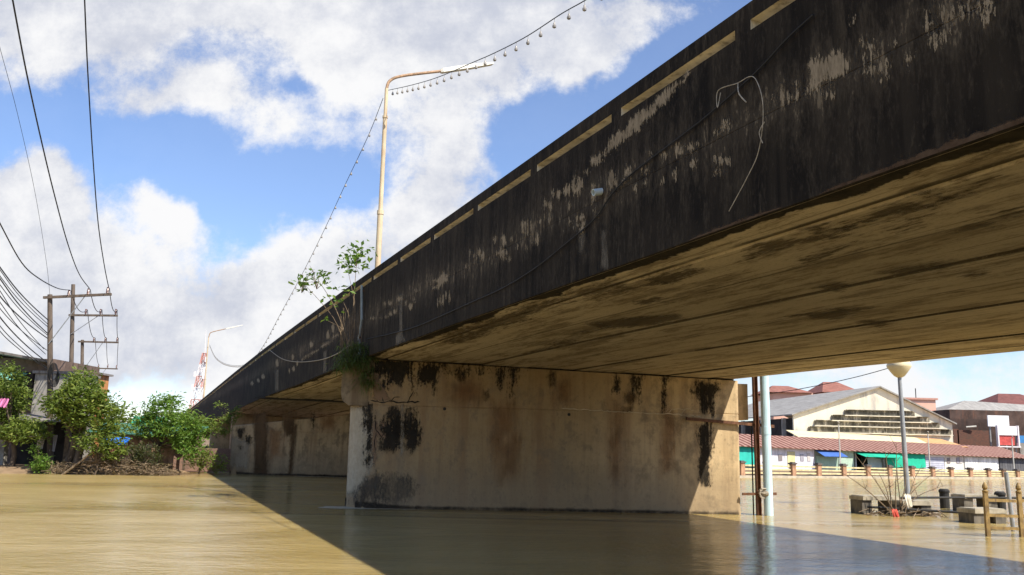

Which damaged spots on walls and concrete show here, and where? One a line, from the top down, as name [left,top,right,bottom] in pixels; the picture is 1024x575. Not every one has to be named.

peeling [924,0,996,53]
peeling [771,48,849,106]
peeling [859,37,890,83]
peeling [465,70,699,267]
peeling [432,272,451,307]
damp [369,126,1024,398]
damp [611,374,646,412]
damp [229,402,739,515]
damp [690,378,721,487]